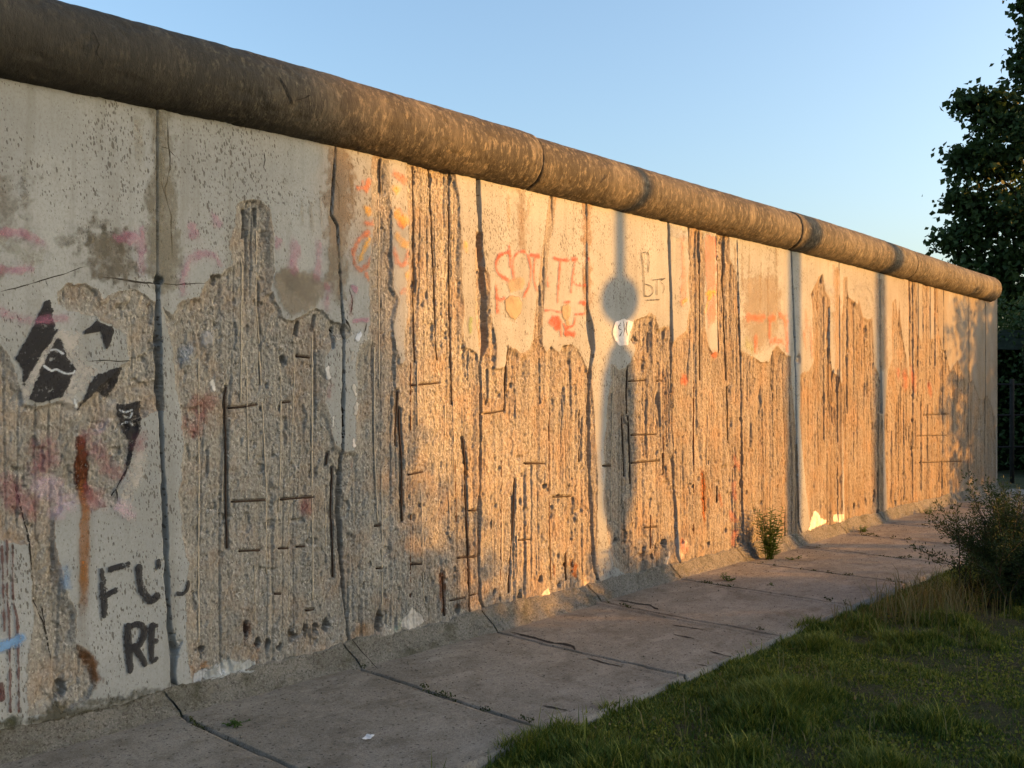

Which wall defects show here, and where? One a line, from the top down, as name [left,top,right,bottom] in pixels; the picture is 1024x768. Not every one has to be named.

damp [62,113,178,288]
crack [162,119,175,242]
spalling [0,155,996,716]
rust [74,436,89,584]
rust [77,647,100,681]